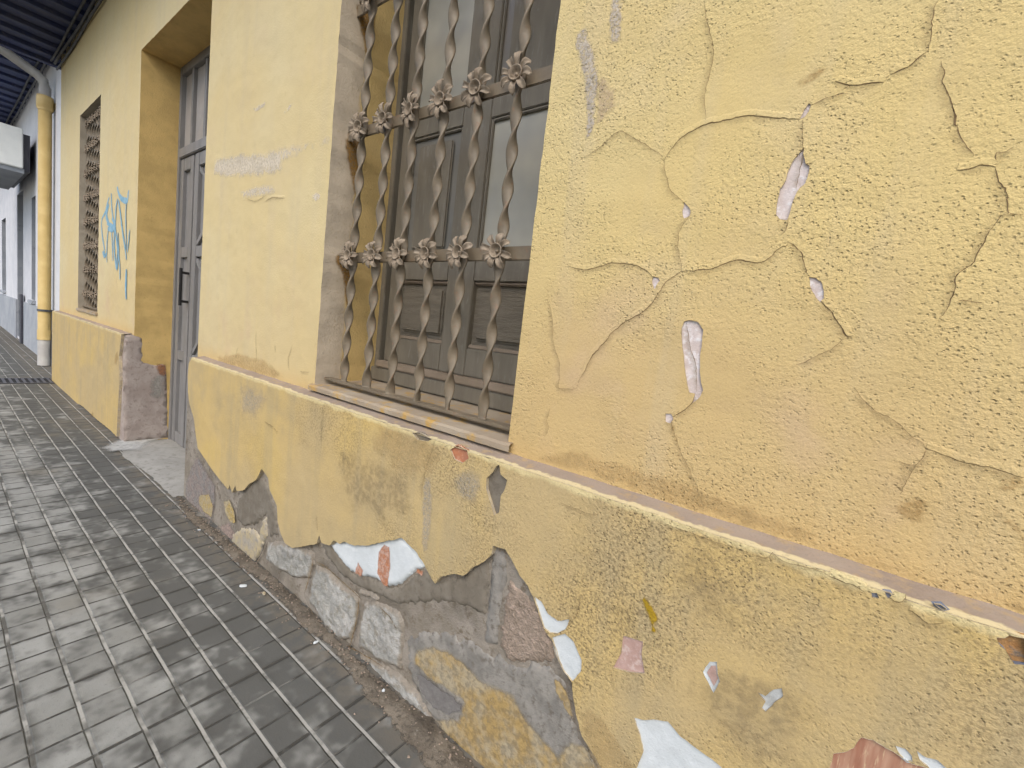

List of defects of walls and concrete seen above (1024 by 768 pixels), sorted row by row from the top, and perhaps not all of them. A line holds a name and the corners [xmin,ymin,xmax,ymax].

crack [546,0,1022,434]
peeling [776,148,810,220]
peeling [123,334,168,441]
peeling [681,320,703,402]
peeling [450,444,469,463]
crack [855,389,1024,493]
flaking render [186,459,597,768]
peeling [613,636,645,674]
peeling [703,662,720,693]
flaking render [997,631,1024,665]
peeling [634,718,722,768]
peeling [830,737,946,768]